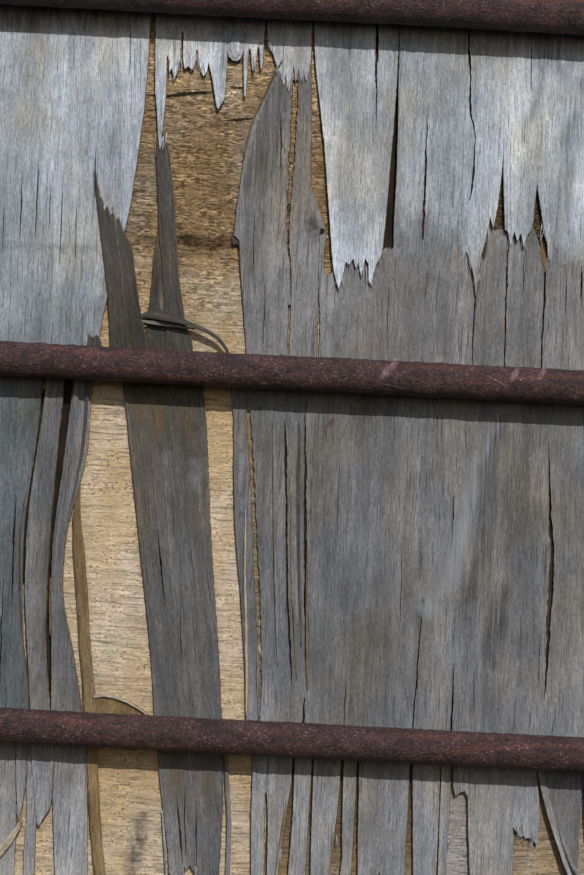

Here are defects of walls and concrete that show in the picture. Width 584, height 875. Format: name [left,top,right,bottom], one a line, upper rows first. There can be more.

peeling [86,13,400,351]
crack [375,24,400,249]
crack [468,28,476,200]
peeling [24,378,93,712]
crack [538,454,554,699]
peeling [0,742,88,875]
peeling [93,694,148,715]
peeling [250,756,582,875]